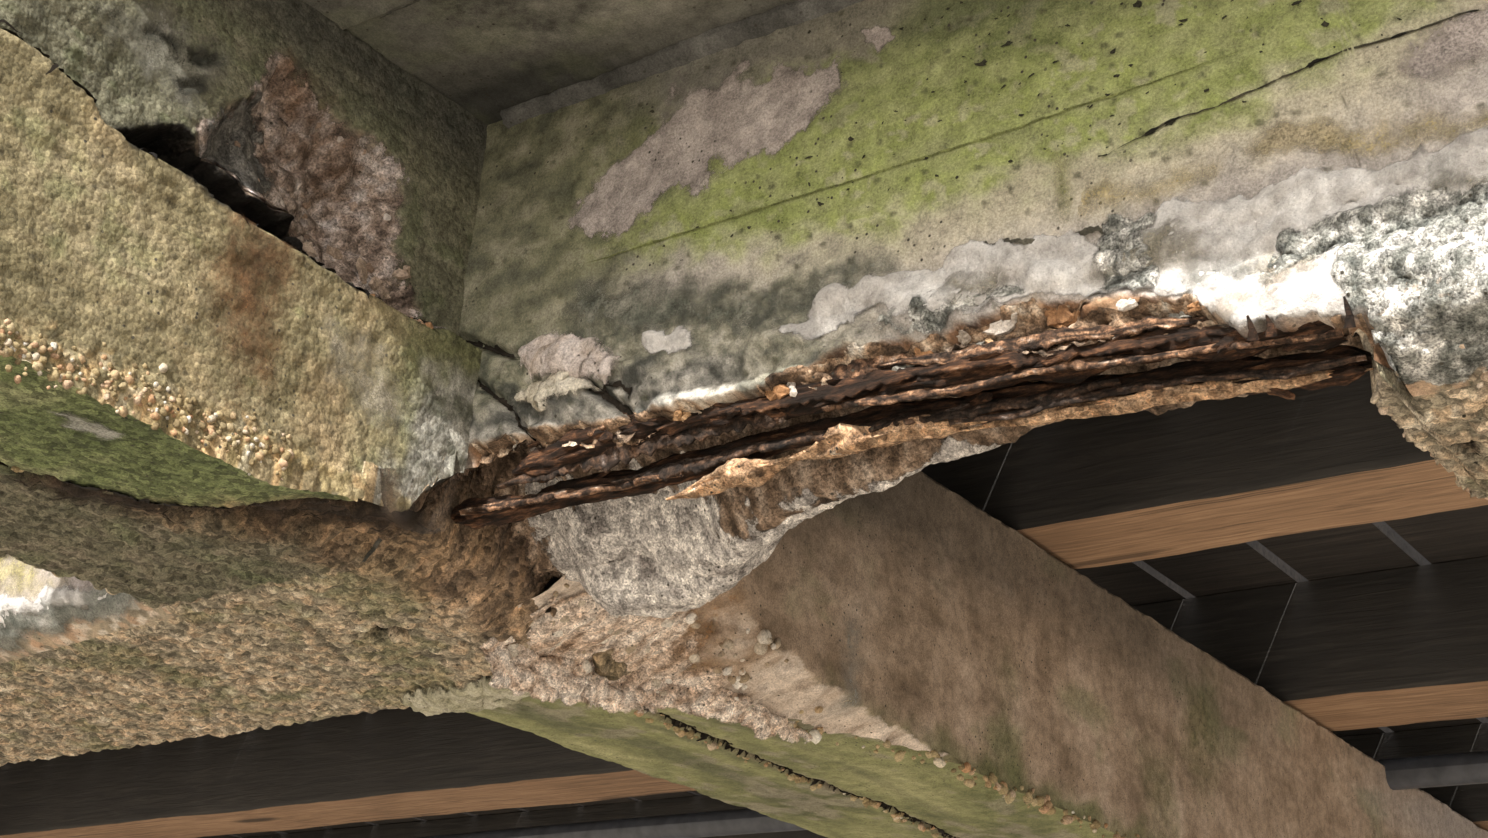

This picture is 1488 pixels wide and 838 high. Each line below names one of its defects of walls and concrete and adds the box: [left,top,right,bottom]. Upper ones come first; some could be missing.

crack [0,19,97,103]
spalling [196,52,445,329]
peeling [568,56,841,238]
water stain [568,117,1488,354]
crack [1098,9,1480,157]
corrosion [15,468,432,534]
crack [235,215,542,447]
spalling [397,332,1335,838]
corrosion [450,316,1373,530]
spalling [757,293,1219,401]
spalling [1246,296,1376,372]
crack [634,706,958,838]